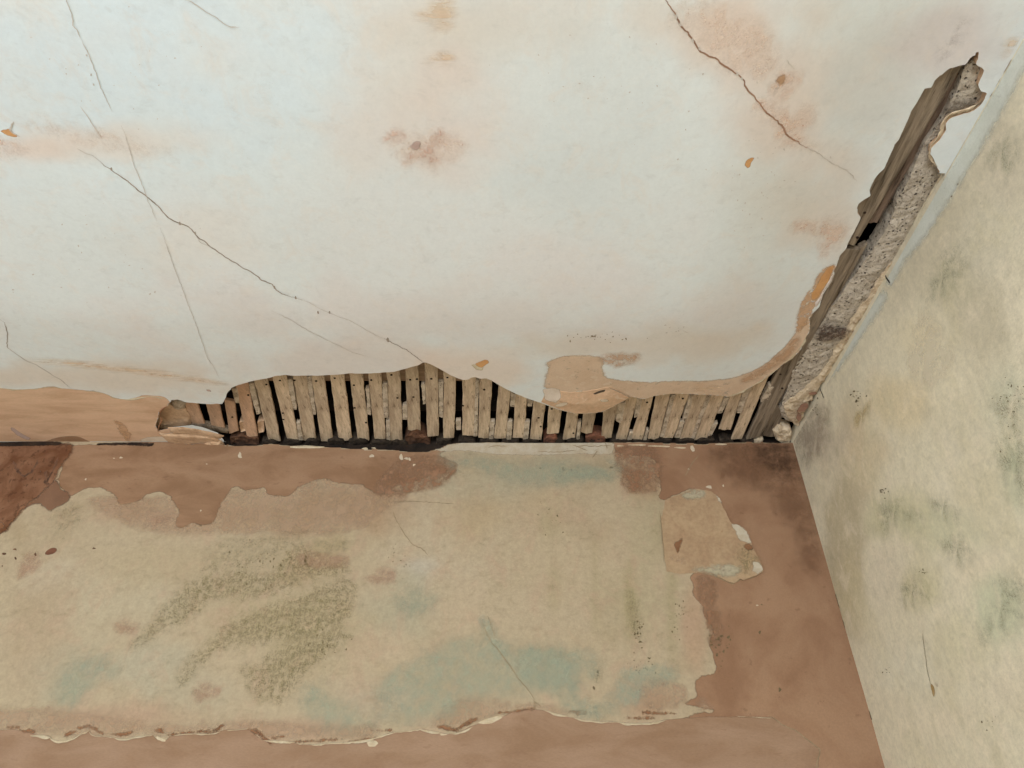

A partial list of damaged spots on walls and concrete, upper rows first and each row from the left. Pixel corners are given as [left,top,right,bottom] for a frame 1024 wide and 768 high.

crack [66,0,421,375]
crack [666,0,854,179]
spalling [772,52,987,443]
water stain [141,539,352,699]
peeling [0,265,885,768]